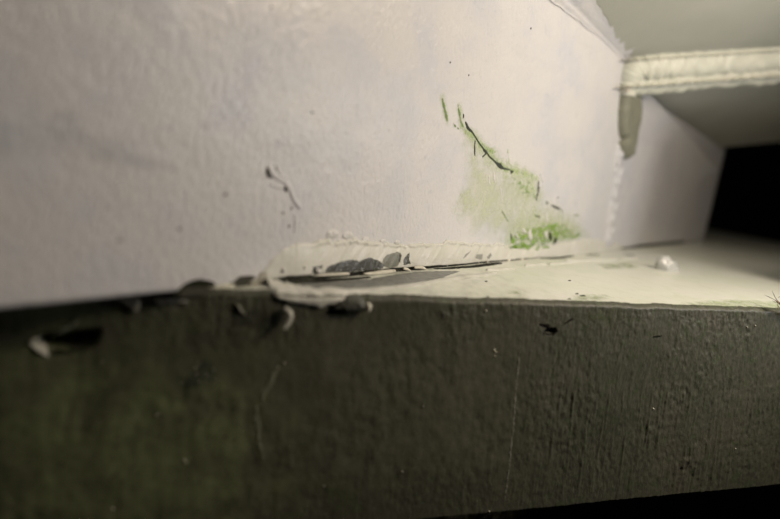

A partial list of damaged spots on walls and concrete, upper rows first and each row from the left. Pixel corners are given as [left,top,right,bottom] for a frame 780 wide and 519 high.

peeling [294,252,460,289]
spalling [26,321,104,357]